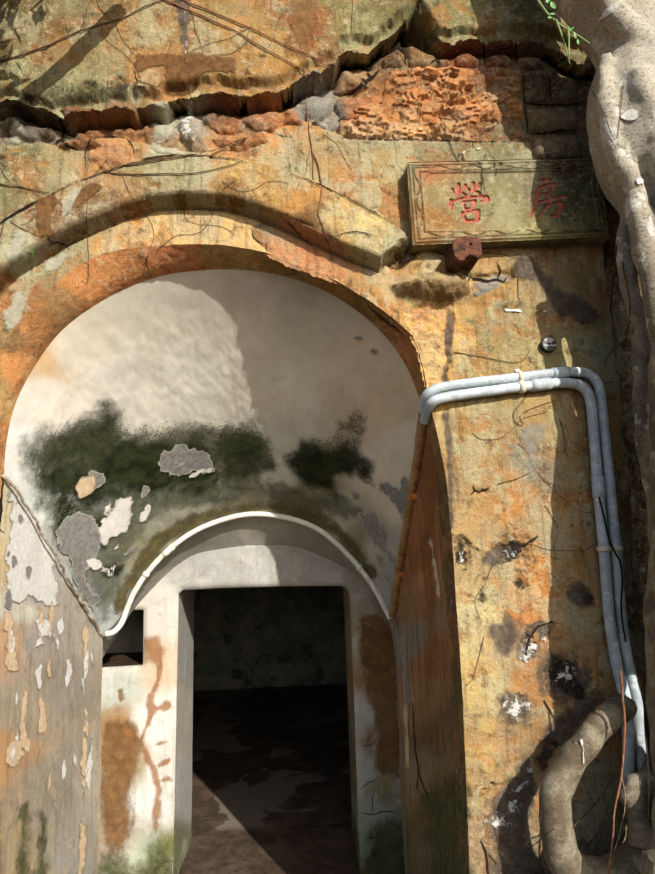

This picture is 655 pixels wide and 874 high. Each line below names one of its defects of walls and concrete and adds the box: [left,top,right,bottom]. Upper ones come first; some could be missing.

spalling [0,38,583,159]
crack [134,0,486,123]
crack [342,39,594,147]
peeling [59,470,106,502]
peeling [158,444,215,478]
damp [24,400,376,620]
peeling [3,485,151,801]
corrosion [101,638,171,850]
corrosion [360,615,410,776]
spalling [516,620,552,661]
peeling [78,821,87,874]